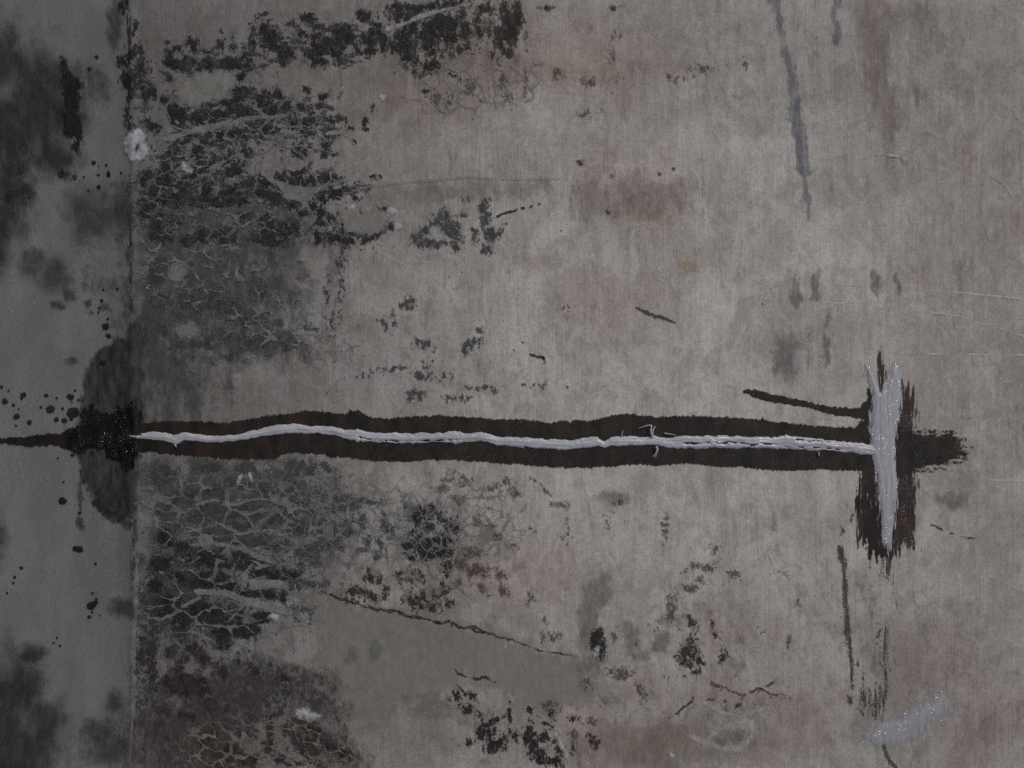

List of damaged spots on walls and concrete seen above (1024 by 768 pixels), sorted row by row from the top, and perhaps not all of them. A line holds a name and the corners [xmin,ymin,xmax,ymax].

water stain [0,32,103,263]
water stain [785,55,810,214]
crack [0,427,86,453]
crack [129,350,973,563]
crack [321,590,571,656]
water stain [0,647,57,768]